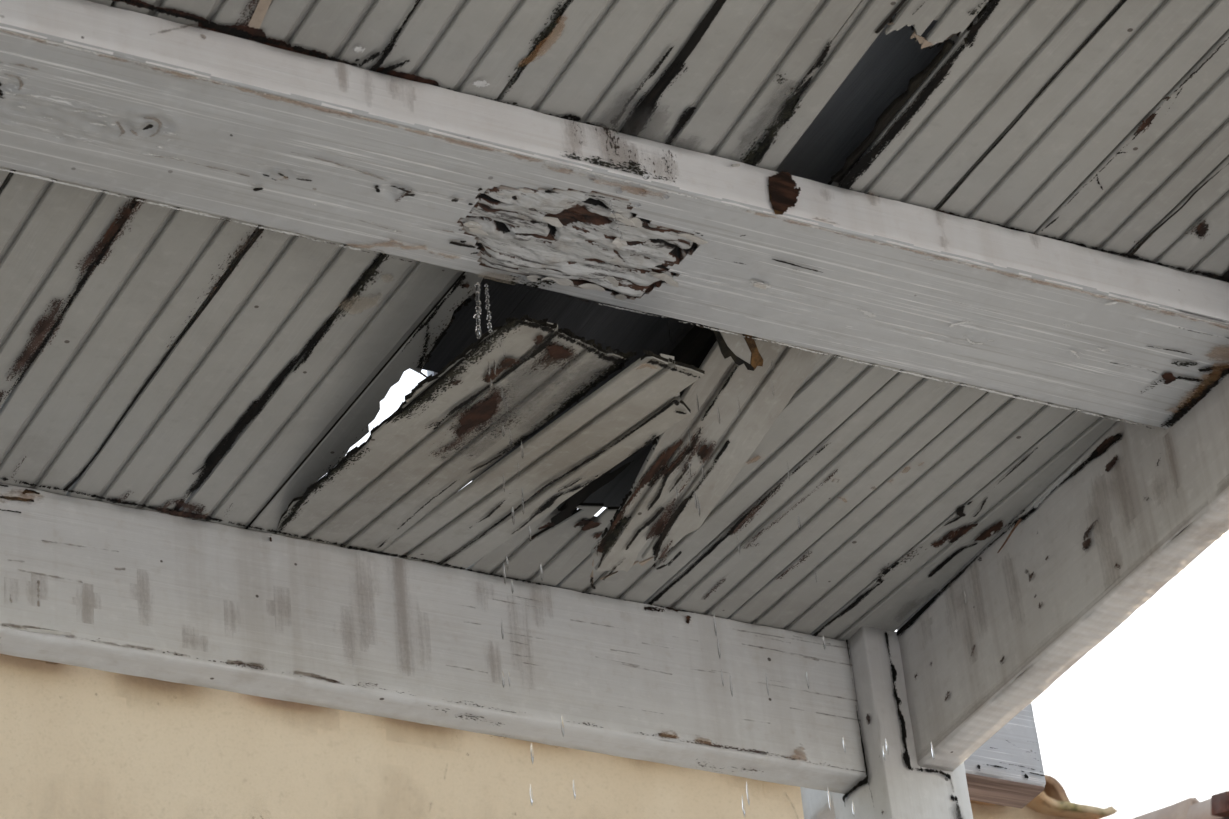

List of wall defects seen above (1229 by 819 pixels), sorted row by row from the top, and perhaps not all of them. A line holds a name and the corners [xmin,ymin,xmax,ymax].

water stain [0,197,147,402]
peeling [543,216,563,227]
peeling [505,269,627,300]
peeling [650,271,679,284]
water stain [0,253,827,613]
crack [594,427,703,568]
peeling [646,438,716,563]